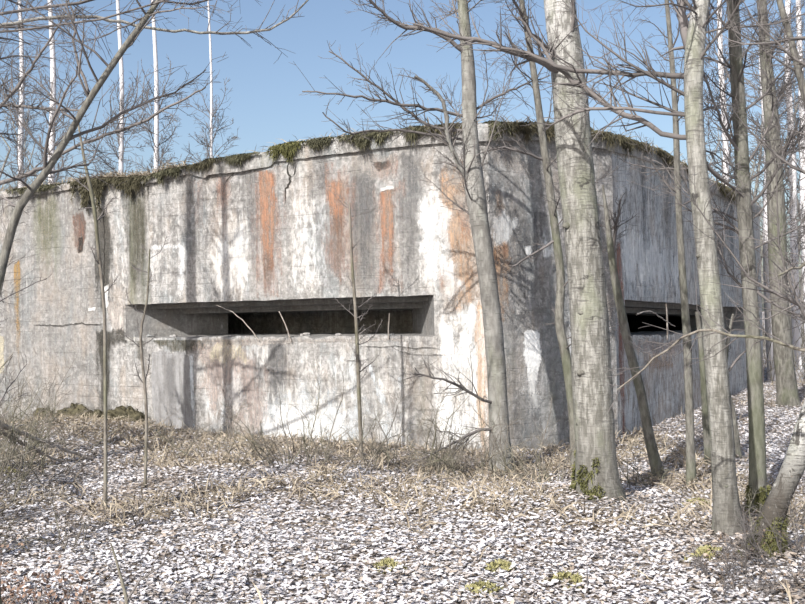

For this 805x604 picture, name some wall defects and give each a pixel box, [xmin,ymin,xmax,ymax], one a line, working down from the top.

crack [99,214,107,281]
leakage [95,209,112,308]
leakage [125,186,185,290]
corrosion [259,170,276,288]
crack [285,163,296,200]
corrosion [380,186,394,289]
corrosion [441,173,472,309]
crack [39,320,103,328]
leakage [96,329,126,411]
corrosion [475,305,487,444]